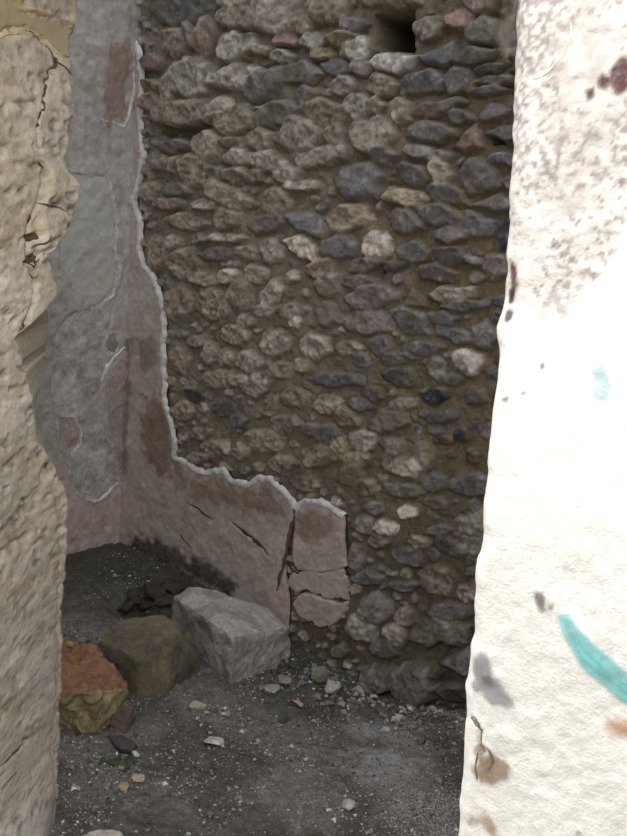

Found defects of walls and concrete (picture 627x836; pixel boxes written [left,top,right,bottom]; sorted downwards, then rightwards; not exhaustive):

flaking render [0,0,75,57]
crack [29,30,73,127]
flaking render [106,41,351,634]
crack [180,502,299,591]
flaking render [45,472,68,799]
damp [474,744,508,784]